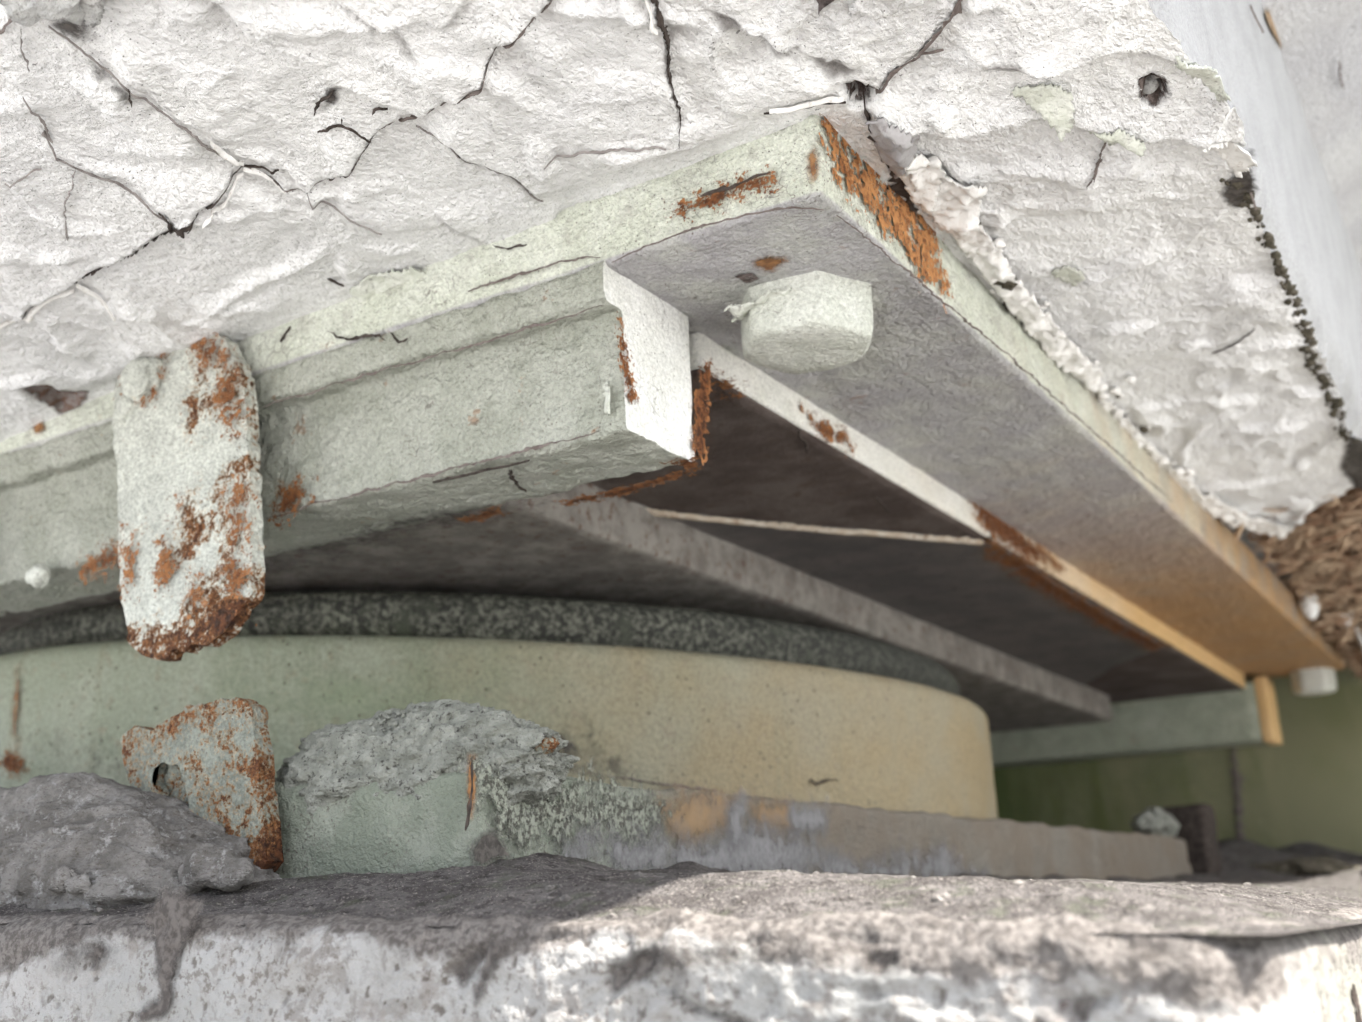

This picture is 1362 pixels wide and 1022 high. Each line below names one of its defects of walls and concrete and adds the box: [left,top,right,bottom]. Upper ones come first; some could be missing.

spalling [0,0,105,28]
crack [0,0,552,330]
crack [468,244,601,292]
crack [644,0,681,148]
rust [664,164,779,223]
crack [764,0,962,115]
rust [808,115,958,314]
flaking render [1012,83,1075,142]
peeling [1202,141,1258,178]
spalling [899,153,1291,539]
rust [554,358,757,506]
rust [74,463,325,629]